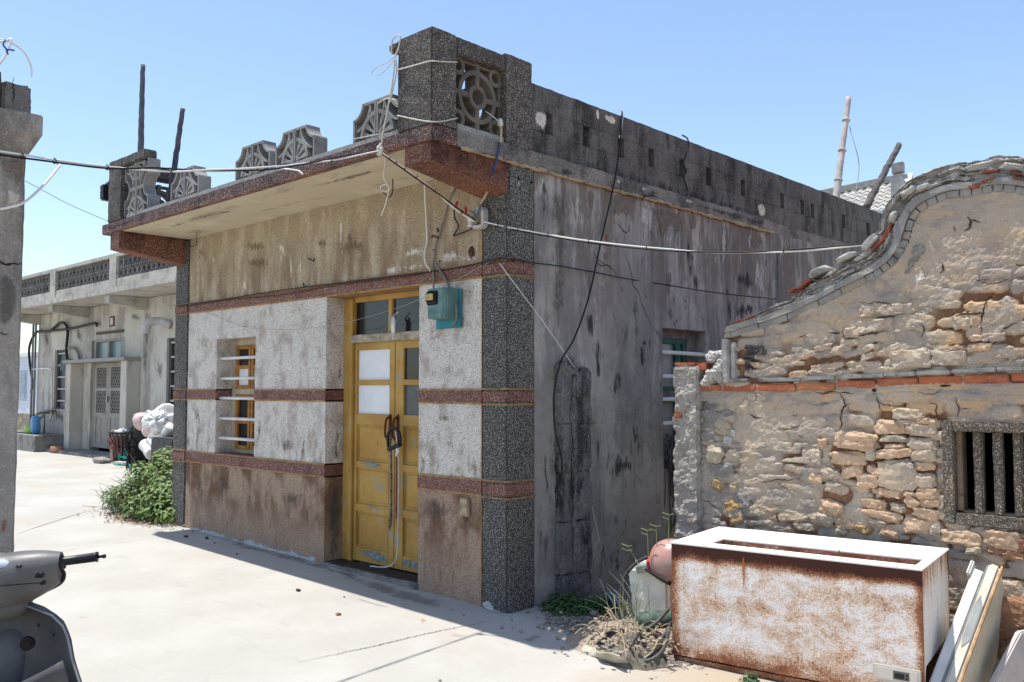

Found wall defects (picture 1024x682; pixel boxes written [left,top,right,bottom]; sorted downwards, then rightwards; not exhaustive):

leakage [632,176,786,287]
leakage [587,315,601,376]
crack [750,264,1023,485]
leakage [614,456,632,475]
spalling [701,397,750,525]
spalling [808,408,1024,560]